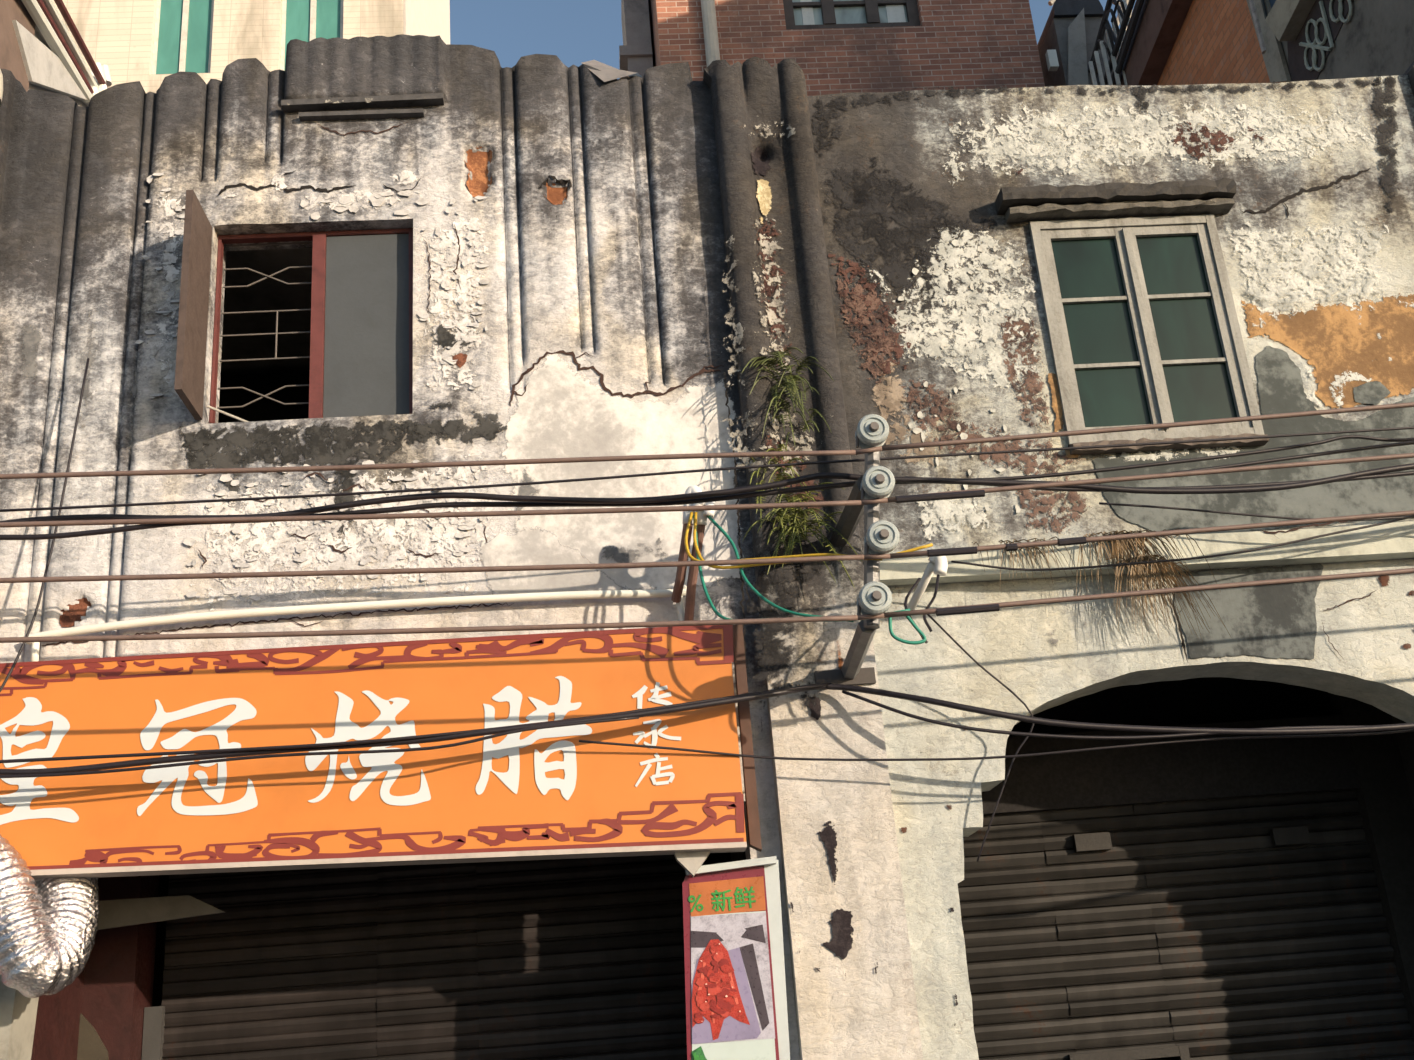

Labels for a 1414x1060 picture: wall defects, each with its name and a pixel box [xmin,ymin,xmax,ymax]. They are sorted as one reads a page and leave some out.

water stain [78,310,97,428]
crack [218,170,421,195]
peeling [182,453,498,612]
water stain [178,401,508,533]
water stain [431,324,476,348]
peeling [417,146,492,390]
crack [509,350,750,668]
peeling [722,215,794,387]
peeling [828,227,1092,540]
water stain [812,75,1400,313]
crack [1240,168,1370,218]
flaking render [1226,220,1414,409]